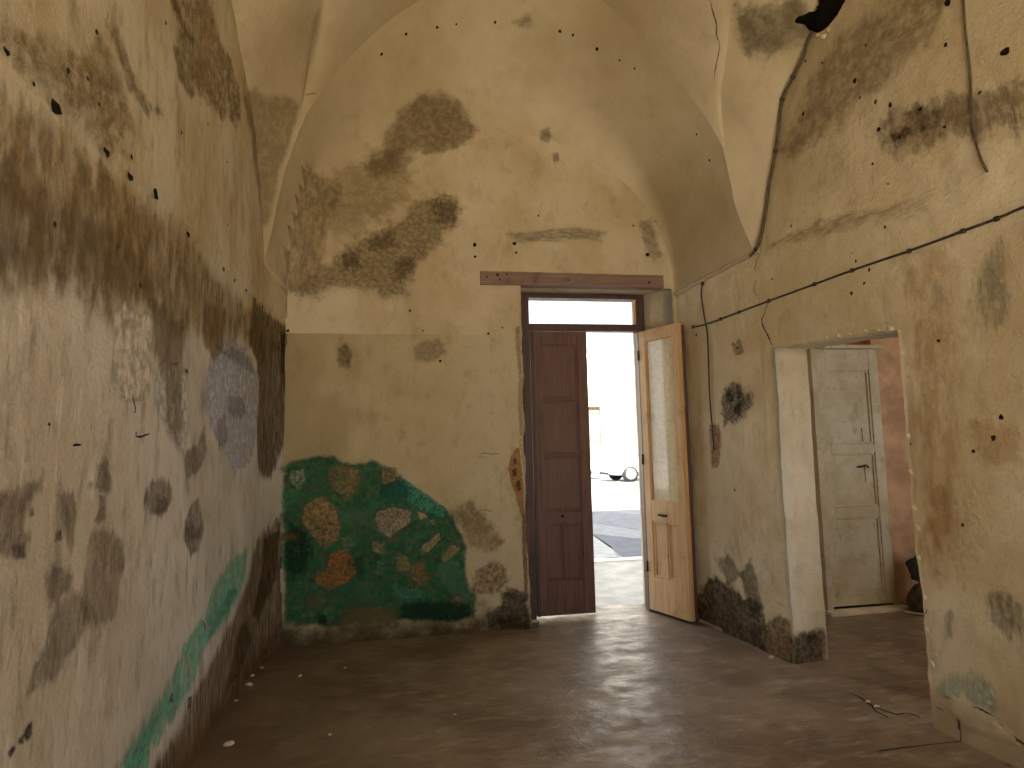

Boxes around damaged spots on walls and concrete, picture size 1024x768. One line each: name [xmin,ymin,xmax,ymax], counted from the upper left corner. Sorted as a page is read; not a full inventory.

crack [709,0,720,77]
hole [795,0,845,39]
mould [388,96,473,159]
leakage [883,83,1024,148]
leakage [286,167,457,295]
leakage [0,112,288,477]
mould [721,382,753,425]
leakage [474,563,530,630]
leakage [696,565,826,664]
crack [852,693,1024,751]